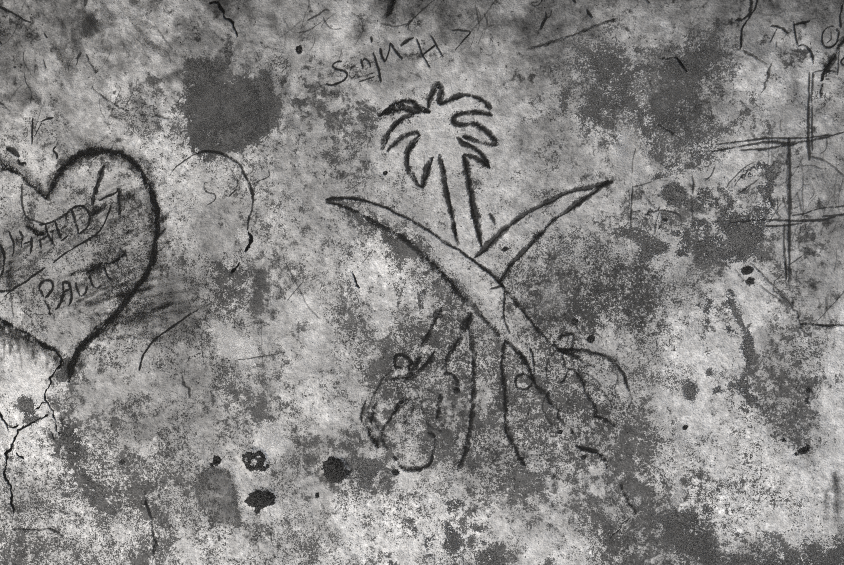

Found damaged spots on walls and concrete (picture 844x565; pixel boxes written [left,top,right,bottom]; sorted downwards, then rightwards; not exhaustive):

crack [0,357,64,537]